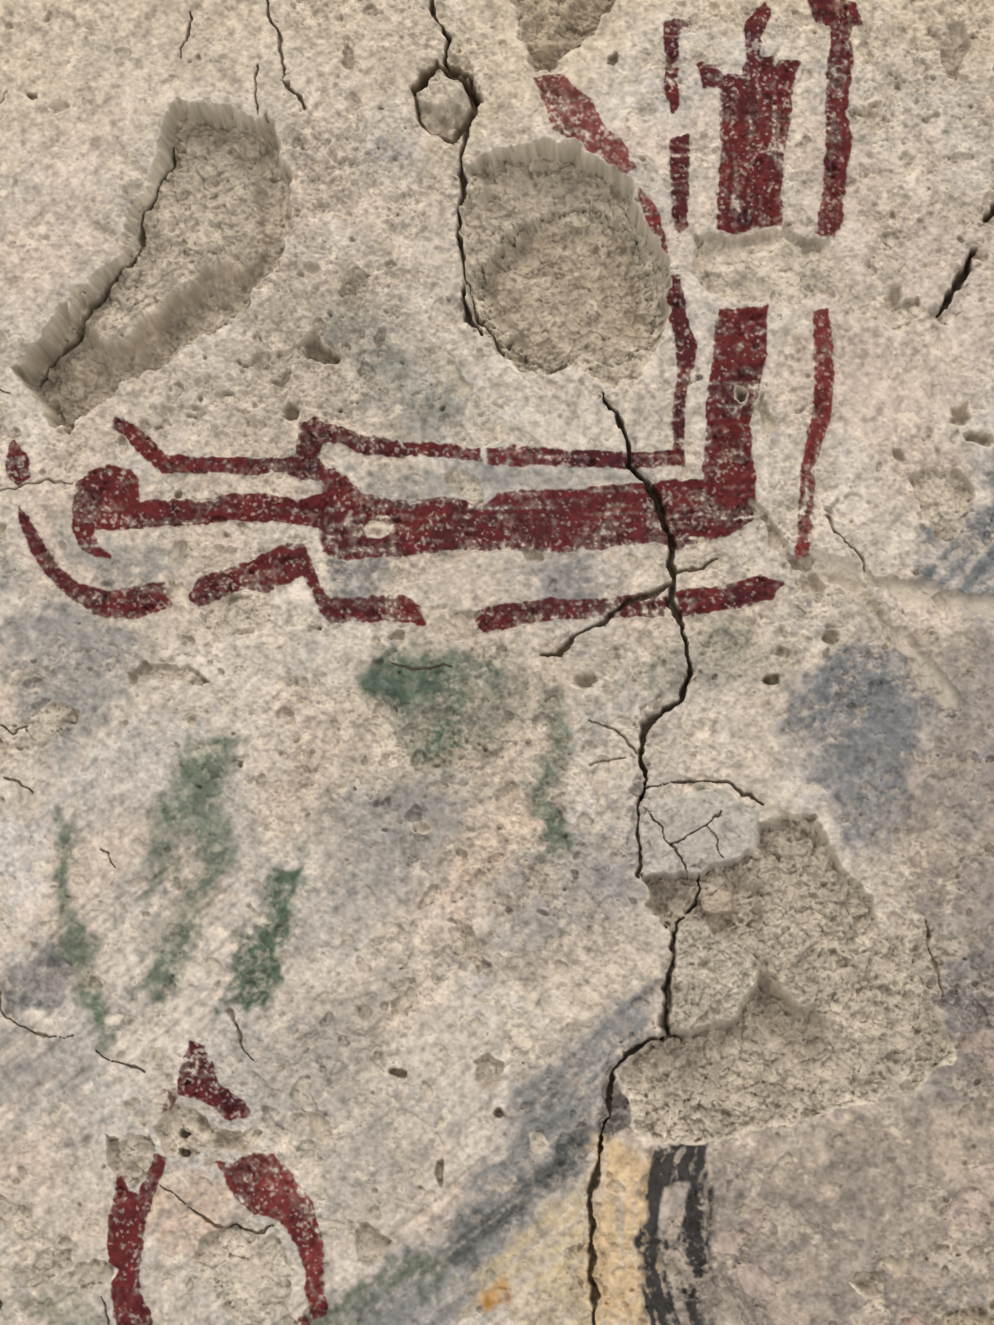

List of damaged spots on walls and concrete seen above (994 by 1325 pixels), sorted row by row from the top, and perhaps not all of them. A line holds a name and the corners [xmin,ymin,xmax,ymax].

spalling [11,97,295,437]
crack [409,0,485,337]
spalling [459,136,673,390]
peeling [690,229,930,332]
crack [392,662,453,672]
crack [540,391,766,880]
peeling [0,1194,115,1295]
crack [586,872,702,1325]
spalling [615,812,994,1149]